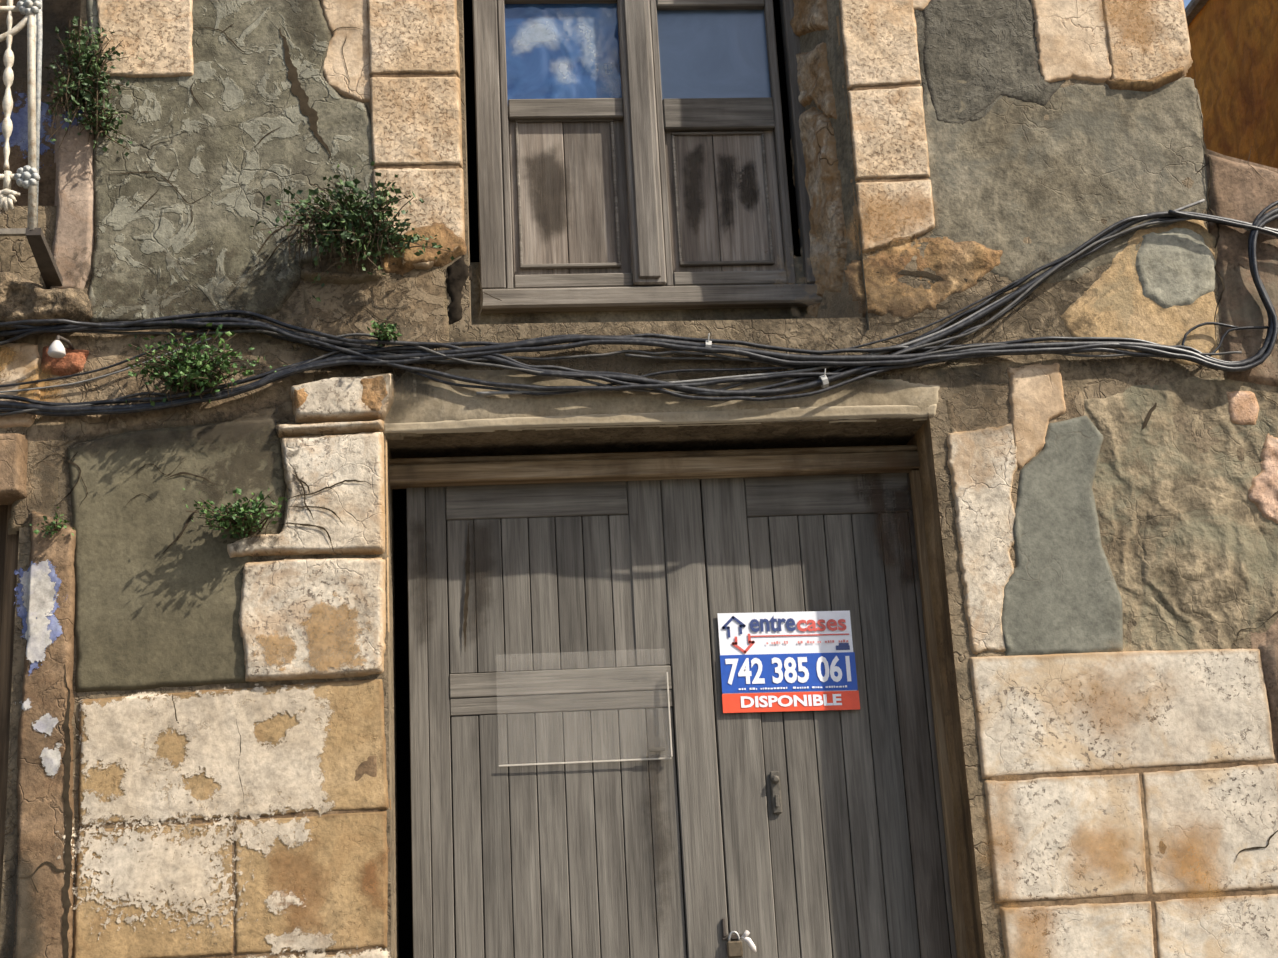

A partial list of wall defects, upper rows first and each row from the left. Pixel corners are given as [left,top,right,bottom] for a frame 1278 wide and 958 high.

spalling [922,0,1066,125]
leakage [529,154,567,231]
leakage [686,145,703,229]
leakage [719,156,758,225]
crack [124,462,182,507]
peeling [1001,415,1123,656]
peeling [14,559,65,676]
peeling [15,699,62,778]
peeling [56,591,370,948]
peeling [246,926,391,958]